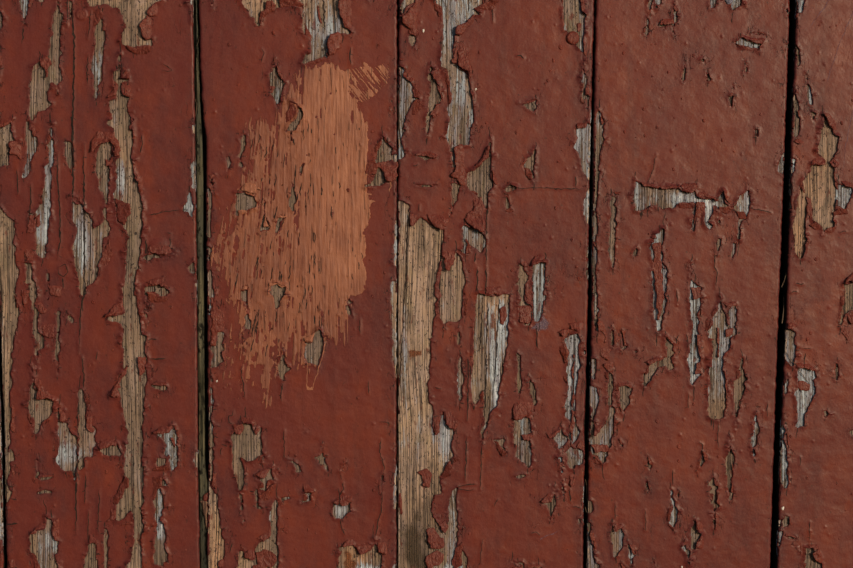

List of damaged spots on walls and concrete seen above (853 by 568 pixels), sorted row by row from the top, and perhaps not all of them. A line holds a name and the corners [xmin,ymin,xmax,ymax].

peeling [242,0,352,73]
peeling [0,0,178,568]
peeling [183,157,196,220]
peeling [206,174,228,568]
peeling [229,407,290,568]
peeling [330,496,352,521]
peeling [337,0,549,568]
peeling [541,73,638,568]
peeling [630,172,753,394]
peeling [686,255,748,429]
peeling [778,322,817,496]
peeling [776,44,853,265]